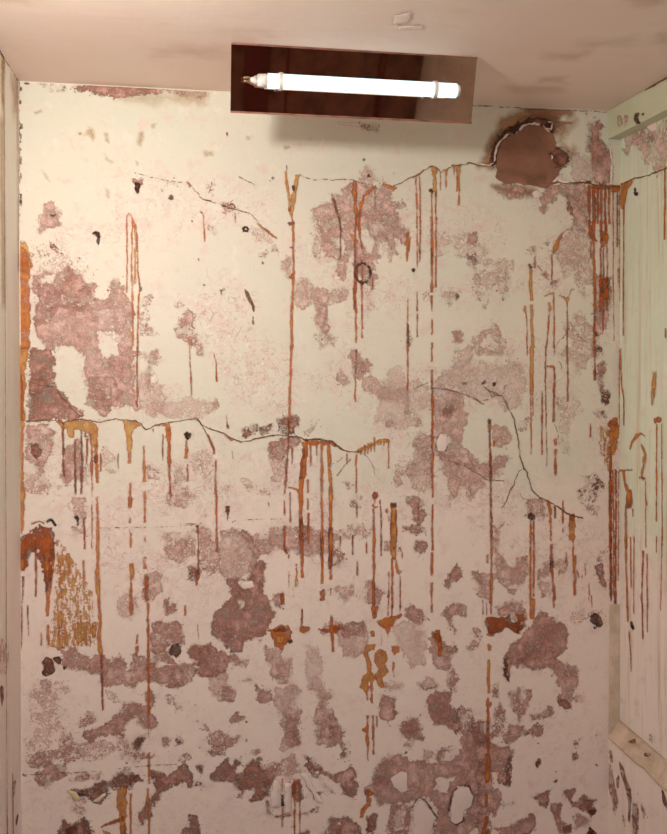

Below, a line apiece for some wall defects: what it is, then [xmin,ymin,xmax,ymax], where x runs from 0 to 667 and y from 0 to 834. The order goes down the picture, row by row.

rust [20,241,104,711]
peeling [23,242,218,495]
crack [20,381,375,474]
crack [134,172,277,239]
peeling [26,506,606,834]
rust [283,168,397,601]
rust [360,491,403,703]
peeling [332,324,530,554]
crack [418,383,583,519]
peeling [490,113,667,418]
crack [544,168,667,188]
rust [589,348,663,639]